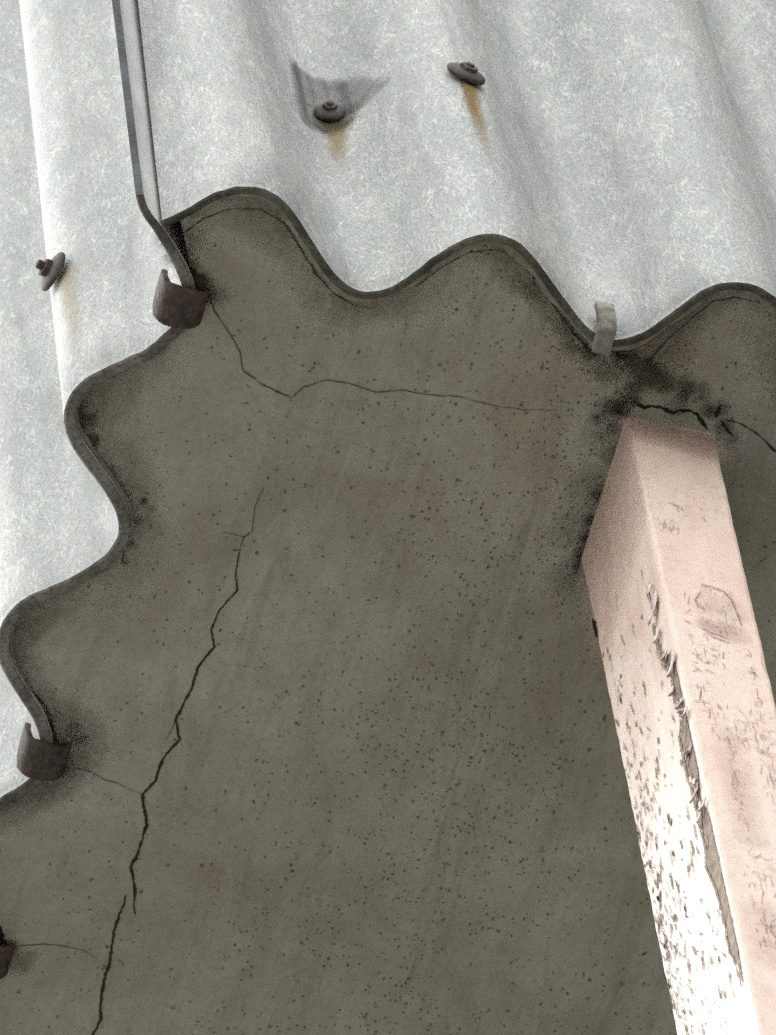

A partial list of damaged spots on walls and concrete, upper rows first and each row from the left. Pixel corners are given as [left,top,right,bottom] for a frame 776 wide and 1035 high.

rust [464,81,480,119]
crack [209,294,552,411]
leakage [595,352,729,431]
crack [633,402,776,452]
leakage [577,516,595,557]
crack [19,488,264,1035]